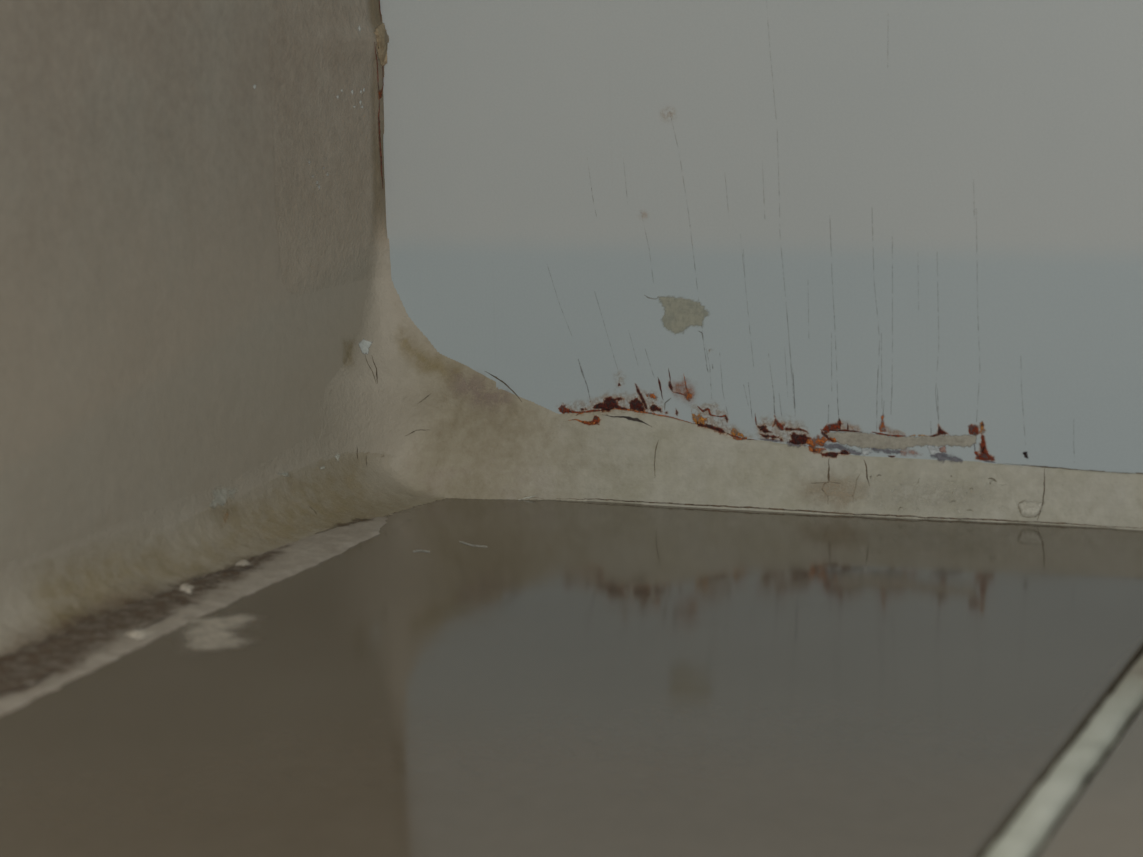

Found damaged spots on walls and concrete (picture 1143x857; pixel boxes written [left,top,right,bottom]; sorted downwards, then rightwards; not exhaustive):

peeling [645,295,708,338]
corrosion [558,369,861,458]
spalling [827,431,976,462]
corrosion [873,416,948,437]
corrosion [968,422,996,463]